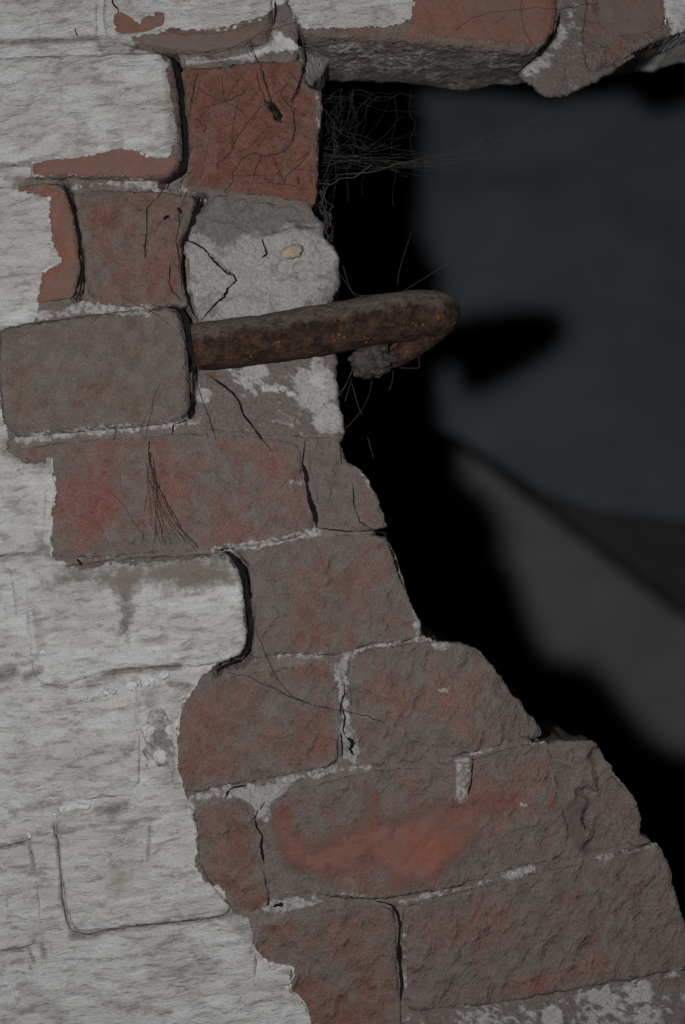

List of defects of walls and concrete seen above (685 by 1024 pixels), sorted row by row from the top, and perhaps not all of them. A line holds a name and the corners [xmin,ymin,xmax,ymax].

peeling [110,12,167,37]
peeling [408,0,555,45]
peeling [597,0,667,36]
peeling [32,147,178,178]
peeling [39,193,78,300]
crack [169,197,271,450]
corrosion [191,290,461,377]
crack [302,441,406,590]
peeling [175,681,199,794]
crack [340,685,355,756]
peeling [251,944,311,1024]
crack [376,901,404,1000]